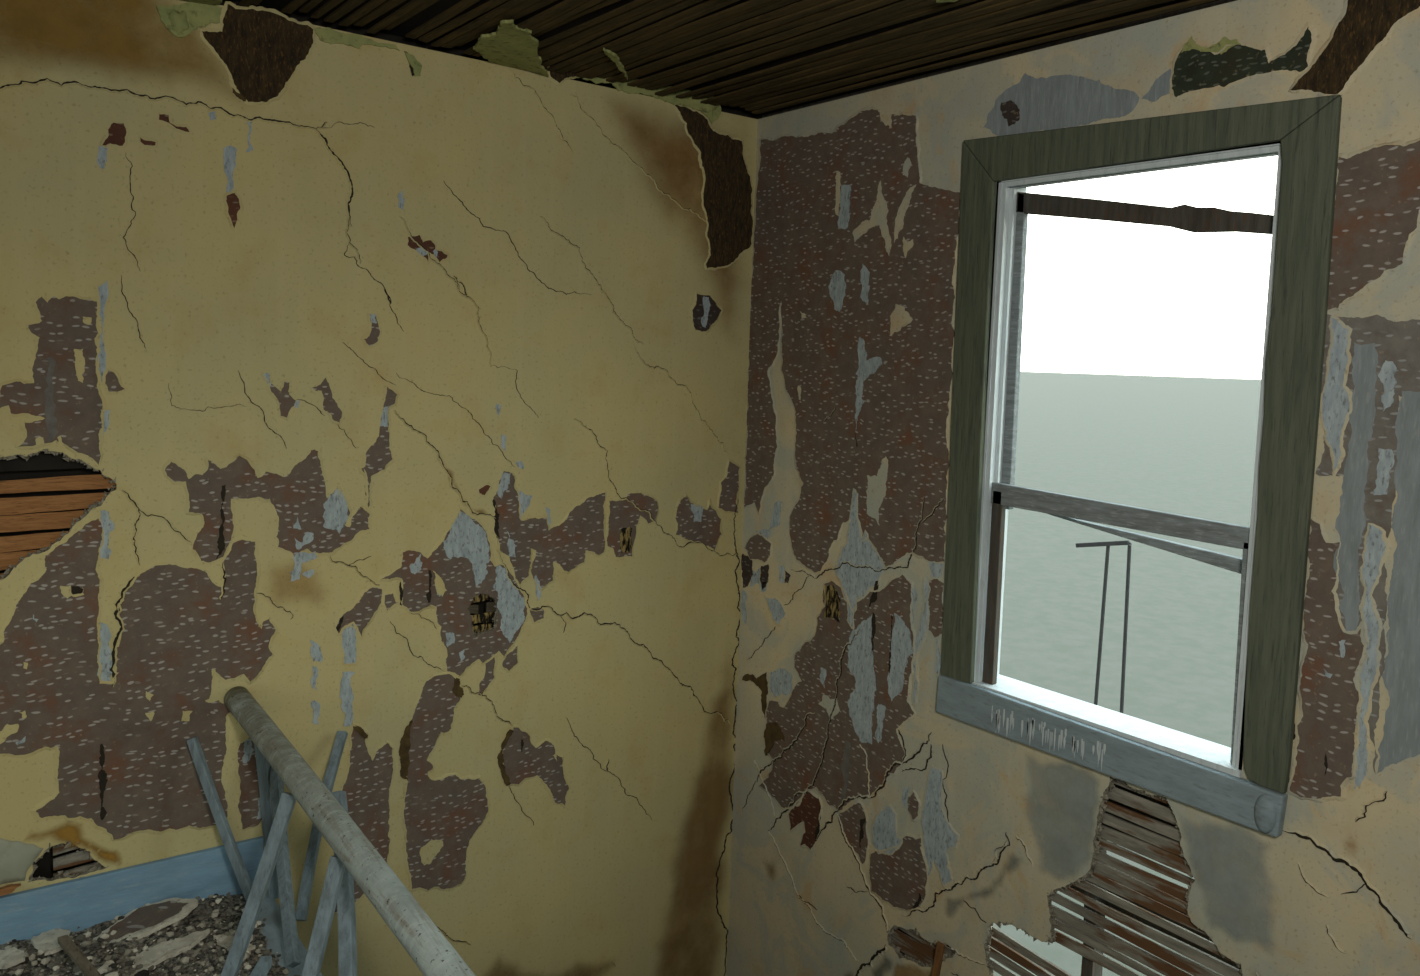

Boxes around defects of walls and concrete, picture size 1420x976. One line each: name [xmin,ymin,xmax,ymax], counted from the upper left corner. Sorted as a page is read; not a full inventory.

crack [109,490,192,687]
peeling [0,292,399,841]
crack [0,78,403,347]
crack [168,373,287,449]
spalling [156,1,422,232]
crack [444,182,729,457]
peeling [332,62,961,967]
crack [343,342,1034,976]
peeling [1287,138,1420,803]
spalling [983,778,1243,976]
crack [1283,829,1413,954]
crack [1355,791,1387,822]